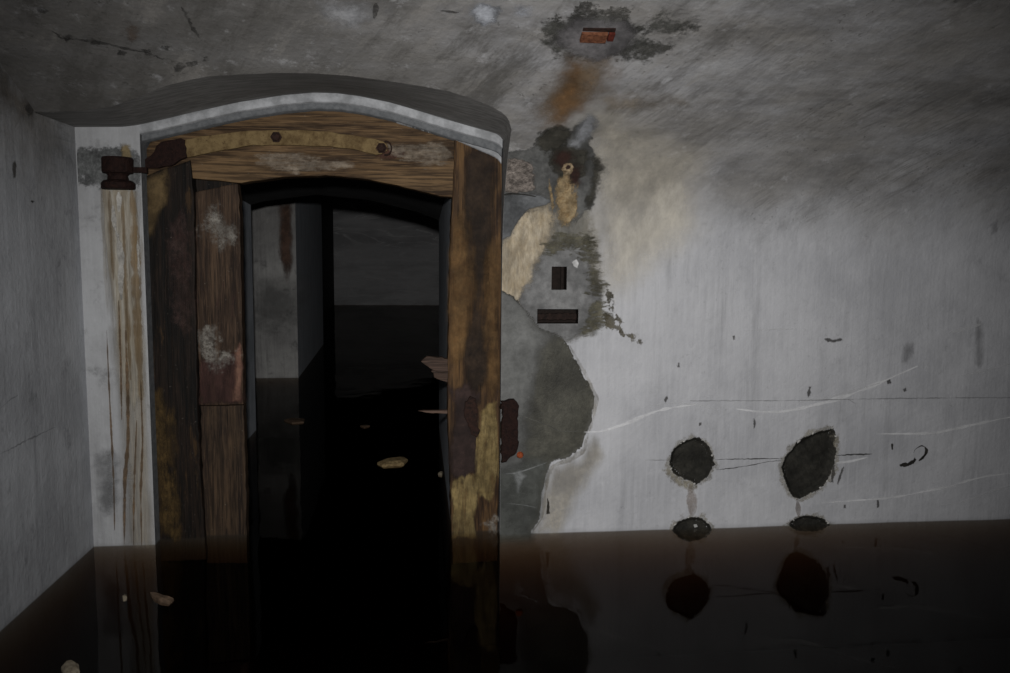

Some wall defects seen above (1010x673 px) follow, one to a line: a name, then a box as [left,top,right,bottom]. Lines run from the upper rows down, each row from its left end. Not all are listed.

flaking render [502,116,604,300]
corrosion [548,58,603,119]
corrosion [102,189,147,545]
peeling [500,291,596,541]